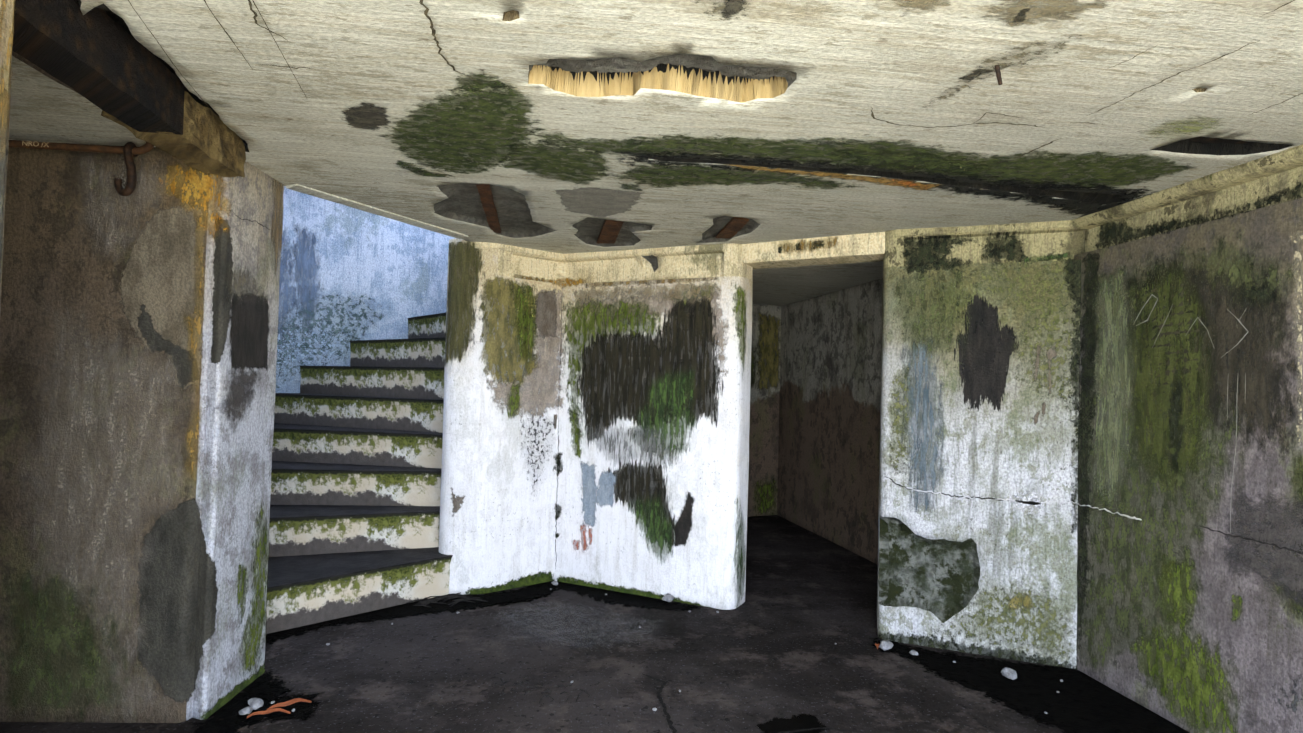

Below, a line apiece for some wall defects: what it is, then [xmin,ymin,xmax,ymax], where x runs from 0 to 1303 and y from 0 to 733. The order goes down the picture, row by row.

crack [128,0,225,127]
crack [204,0,312,98]
crack [419,0,483,84]
spalling [528,53,797,103]
leakage [397,161,455,177]
leakage [555,187,642,217]
leakage [618,147,1149,217]
spalling [1151,136,1293,155]
crack [884,477,1142,520]
spalling [878,516,980,623]